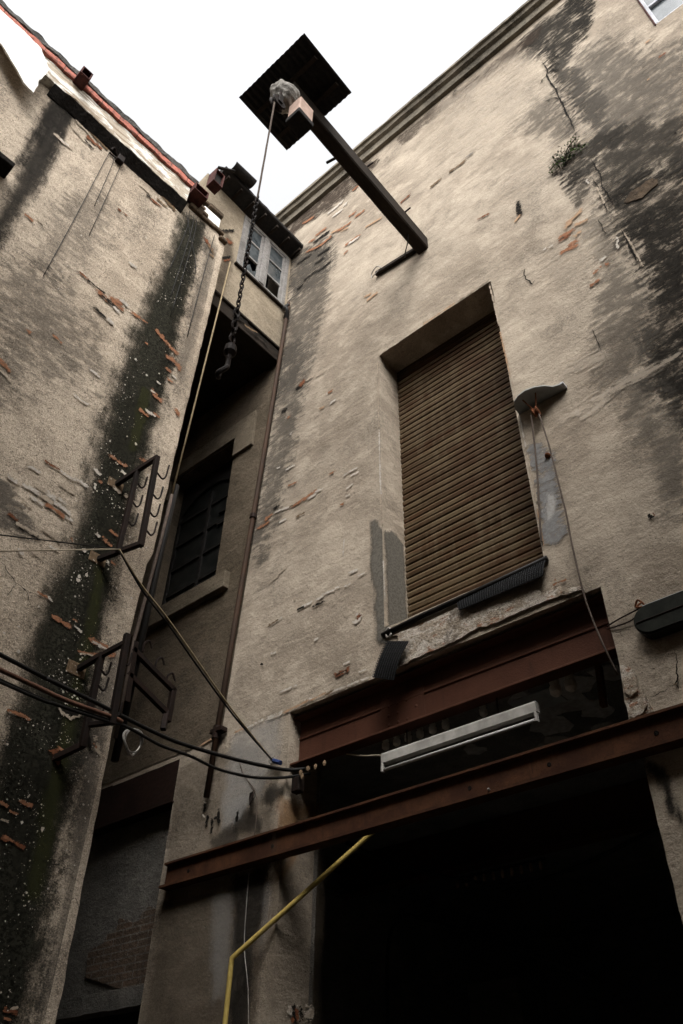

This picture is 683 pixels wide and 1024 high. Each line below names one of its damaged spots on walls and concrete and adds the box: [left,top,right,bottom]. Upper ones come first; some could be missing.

crack [540,62,575,131]
damp [0,100,73,250]
damp [286,176,358,235]
spalling [297,186,381,290]
damp [397,0,683,431]
spalling [544,209,589,254]
spalling [80,272,182,418]
spalling [7,460,128,521]
flaking render [7,513,73,558]
spalling [37,590,116,658]
damp [0,212,207,1024]
flaking render [392,578,585,667]